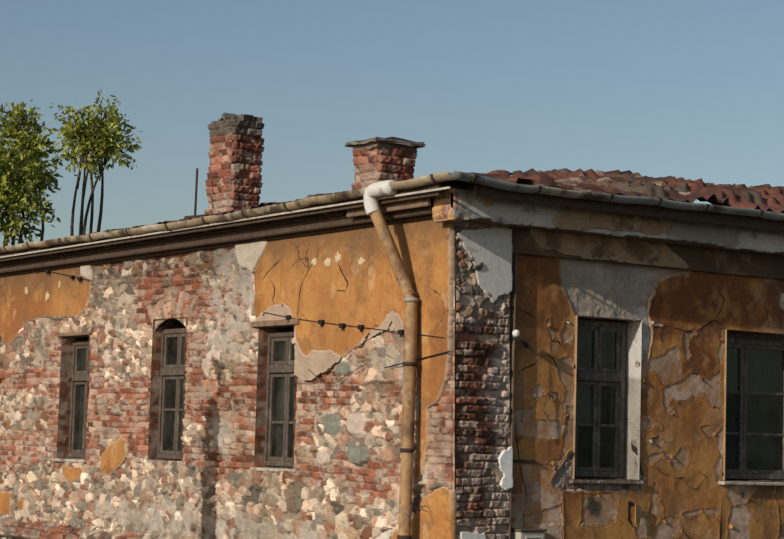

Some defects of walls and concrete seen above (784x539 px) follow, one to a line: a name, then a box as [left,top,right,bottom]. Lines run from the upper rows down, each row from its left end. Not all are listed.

flaking render [311,251,341,266]
flaking render [254,303,341,381]
flaking render [357,311,404,347]
crack [516,310,561,398]
flaking render [530,208,725,416]
crack [652,286,725,341]
flaking render [511,356,689,539]
crack [631,437,702,490]
crack [628,501,636,530]
flaking render [635,479,719,539]
crack [706,502,722,539]
flaking render [727,485,757,539]